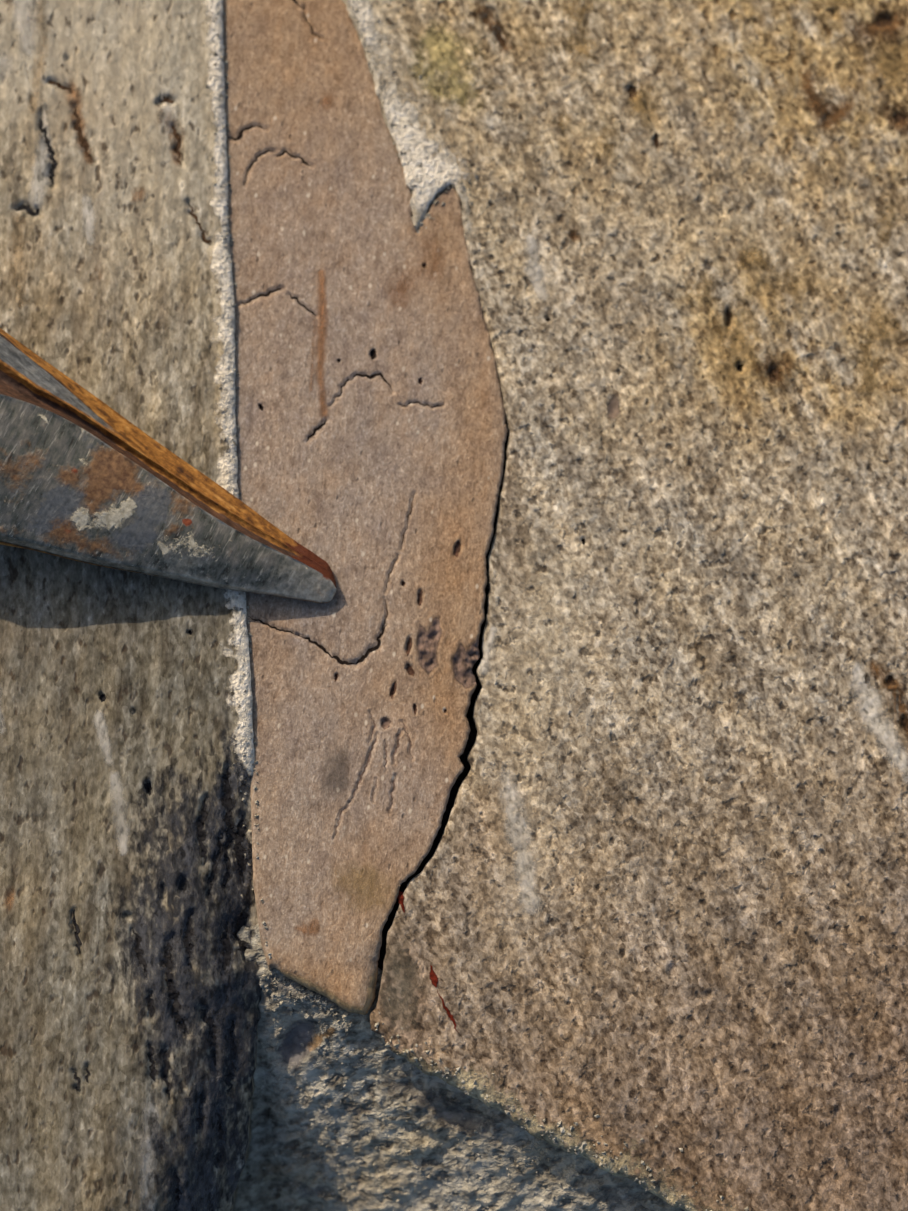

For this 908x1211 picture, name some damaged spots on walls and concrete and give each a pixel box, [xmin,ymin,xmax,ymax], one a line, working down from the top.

rust [69,83,91,163]
crack [227,126,310,186]
spalling [342,0,470,234]
damp [203,0,239,499]
crack [238,288,317,317]
crack [306,373,444,442]
crack [250,493,415,665]
crack [486,418,509,588]
spalling [390,637,415,699]
damp [94,589,321,1211]
crack [378,718,477,971]
spalling [283,971,378,1015]